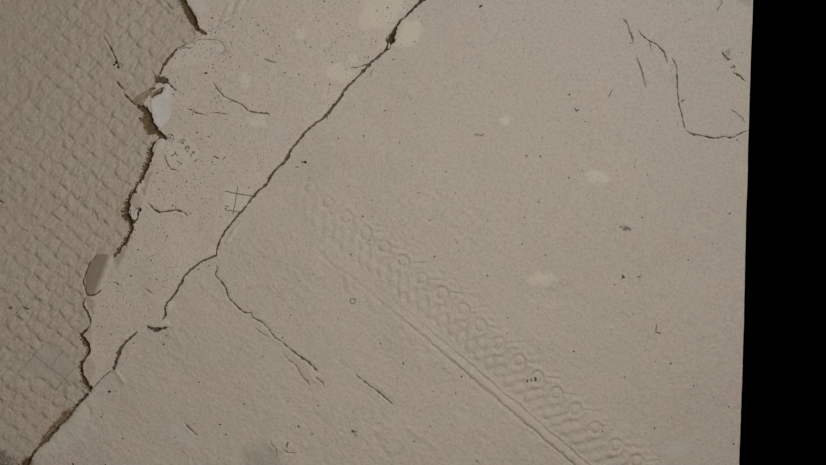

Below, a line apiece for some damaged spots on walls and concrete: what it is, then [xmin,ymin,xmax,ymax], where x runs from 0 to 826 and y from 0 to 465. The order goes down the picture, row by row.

peeling [150,85,176,128]
crack [623,19,747,139]
peeling [86,254,112,295]
crack [19,0,425,465]